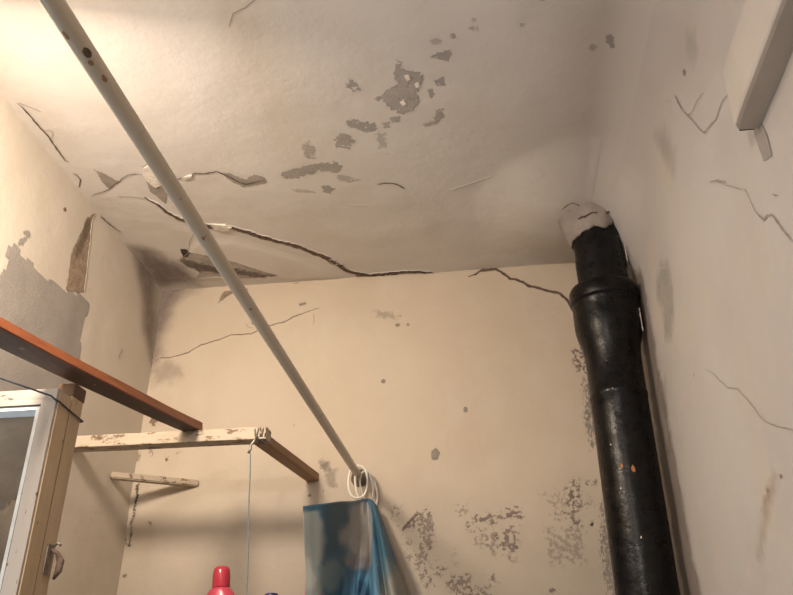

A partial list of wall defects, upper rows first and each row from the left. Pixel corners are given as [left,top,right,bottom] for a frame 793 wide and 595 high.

peeling [376,62,445,122]
crack [633,93,726,134]
crack [20,103,438,277]
peeling [281,144,342,178]
crack [711,179,791,240]
flaking render [0,213,122,360]
spalling [179,249,232,303]
crack [468,268,573,313]
crack [151,308,319,370]
flaking render [0,348,80,392]
crack [693,369,793,430]
flaking render [0,416,35,509]